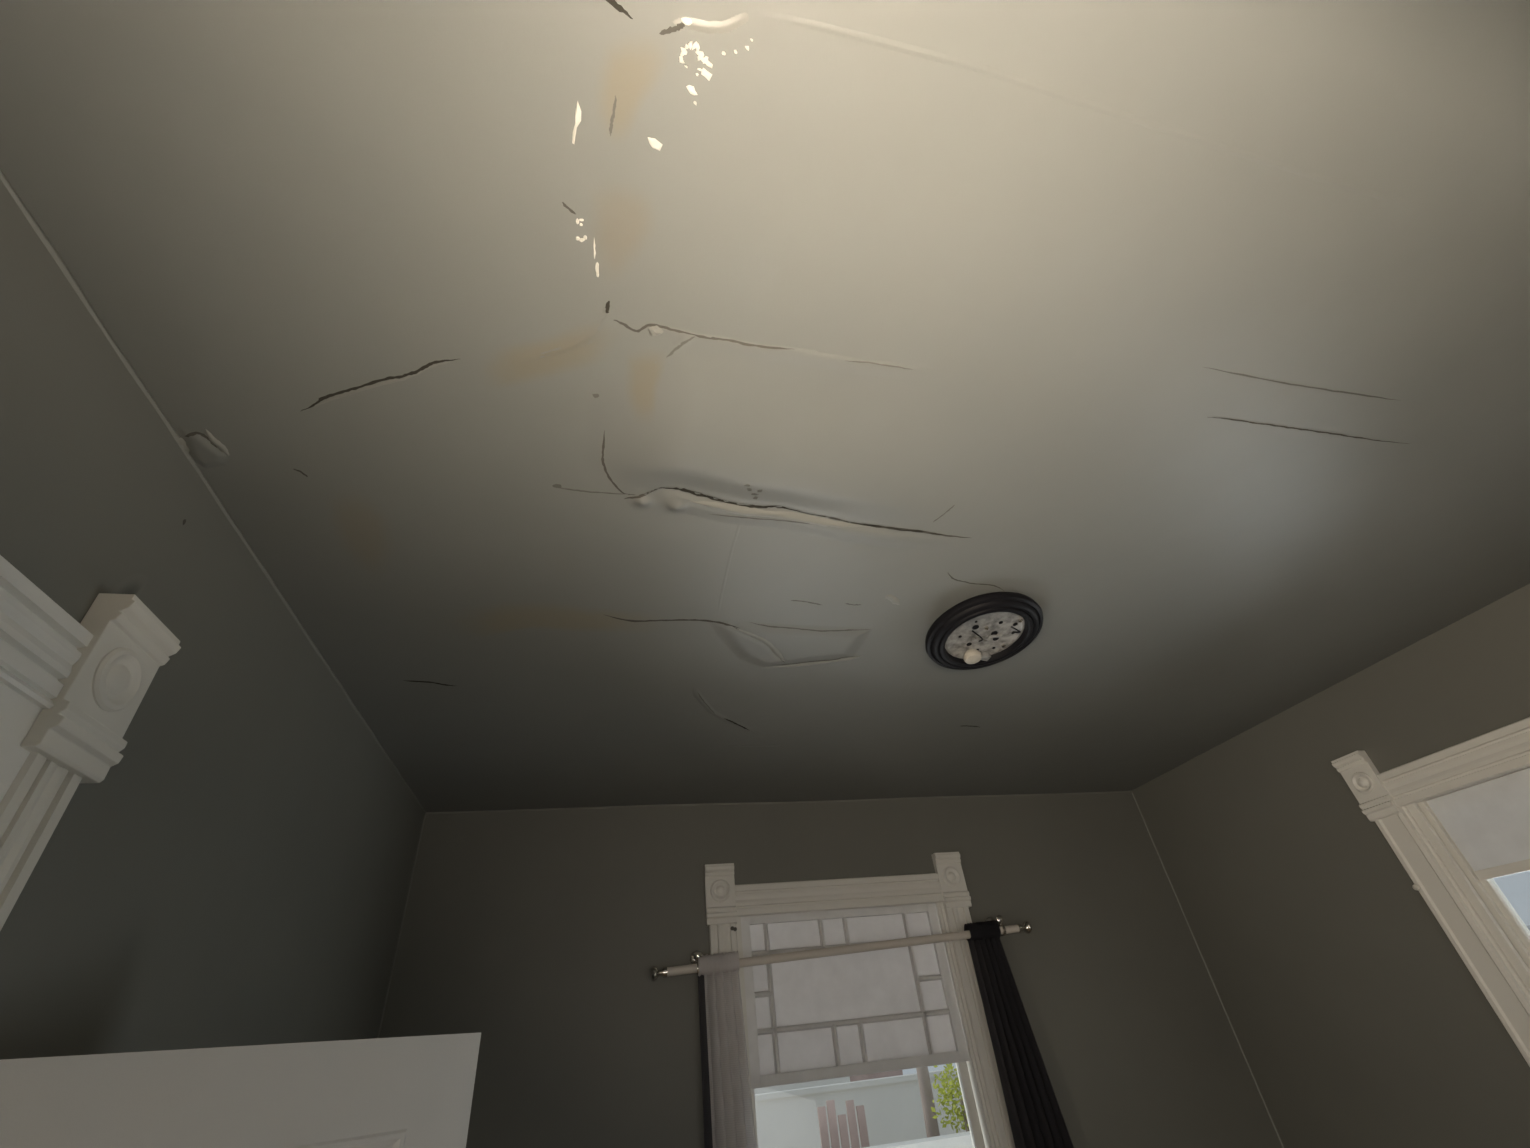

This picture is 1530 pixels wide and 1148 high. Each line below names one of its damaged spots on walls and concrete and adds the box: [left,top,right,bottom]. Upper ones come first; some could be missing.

crack [606,0,749,35]
peeling [679,38,753,105]
crack [539,301,615,358]
crack [301,359,457,411]
crack [1204,367,1400,401]
crack [1208,417,1408,444]